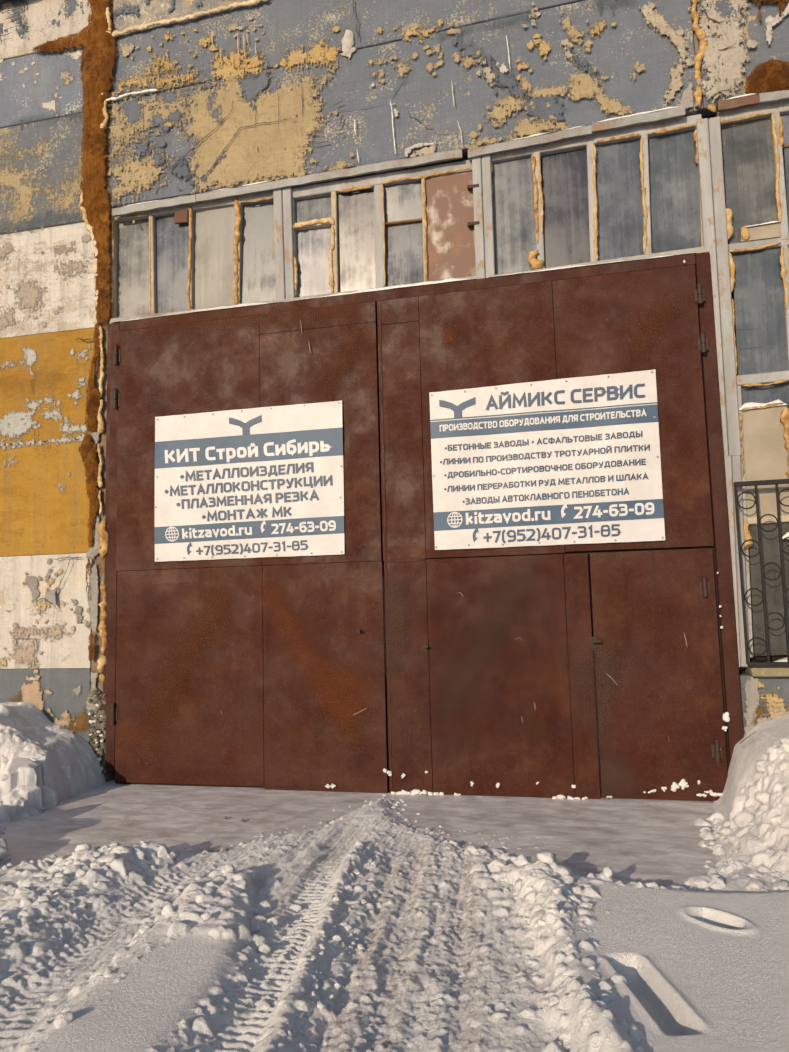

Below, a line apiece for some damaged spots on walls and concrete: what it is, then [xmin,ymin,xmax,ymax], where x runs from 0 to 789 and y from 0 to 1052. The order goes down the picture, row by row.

peeling [0,0,33,40]
peeling [41,47,82,116]
peeling [52,0,86,26]
peeling [103,16,360,208]
peeling [365,1,635,150]
spalling [637,0,789,109]
peeling [0,136,83,268]
peeling [0,234,92,330]
peeling [0,345,37,376]
peeling [0,377,100,467]
peeling [0,515,101,733]
spalling [743,677,789,735]